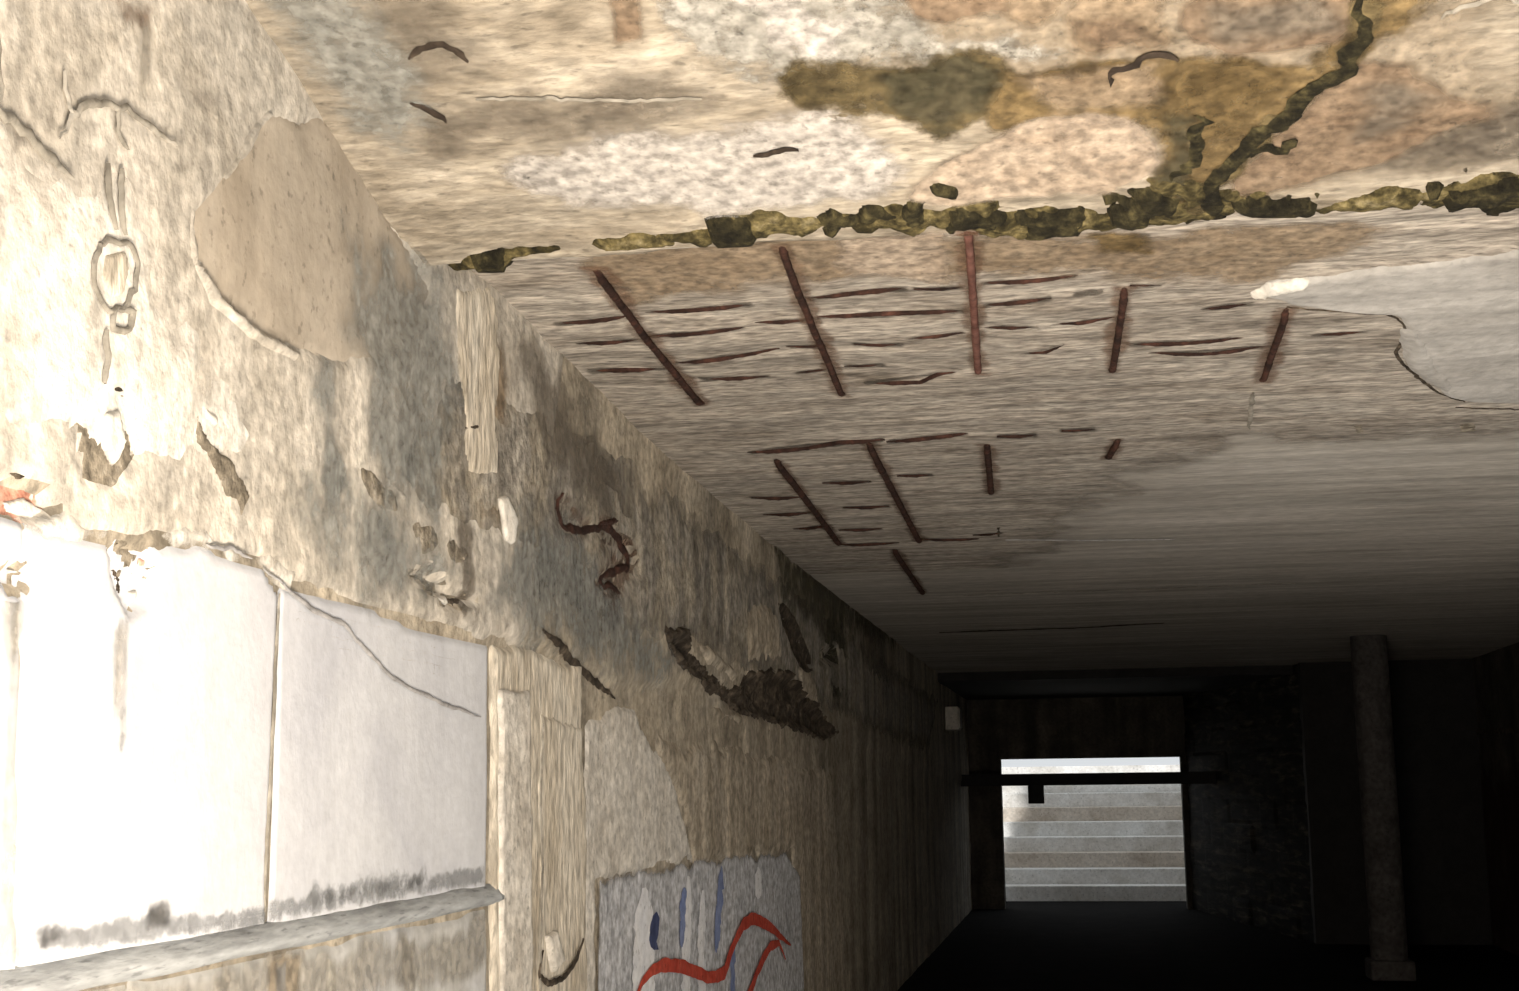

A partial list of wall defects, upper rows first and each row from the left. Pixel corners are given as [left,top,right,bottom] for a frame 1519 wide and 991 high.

damp [431,0,1351,215]
crack [1108,52,1179,88]
crack [1169,0,1374,224]
peeling [190,111,429,362]
damp [583,222,1377,304]
peeling [1250,250,1519,404]
crack [207,544,481,912]
spalling [664,603,839,741]